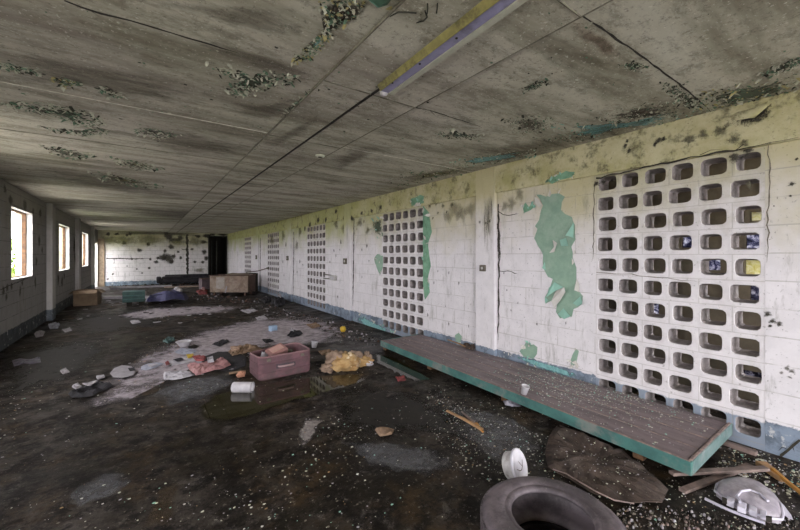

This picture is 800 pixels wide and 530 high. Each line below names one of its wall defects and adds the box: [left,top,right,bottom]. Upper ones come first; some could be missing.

crack [583,16,711,112]
leakage [682,123,729,143]
leakage [729,137,754,162]
peeling [363,216,384,239]
peeling [374,254,383,275]
peeling [410,195,432,299]
crack [497,204,517,337]
peeling [520,171,583,323]
crack [592,137,798,282]